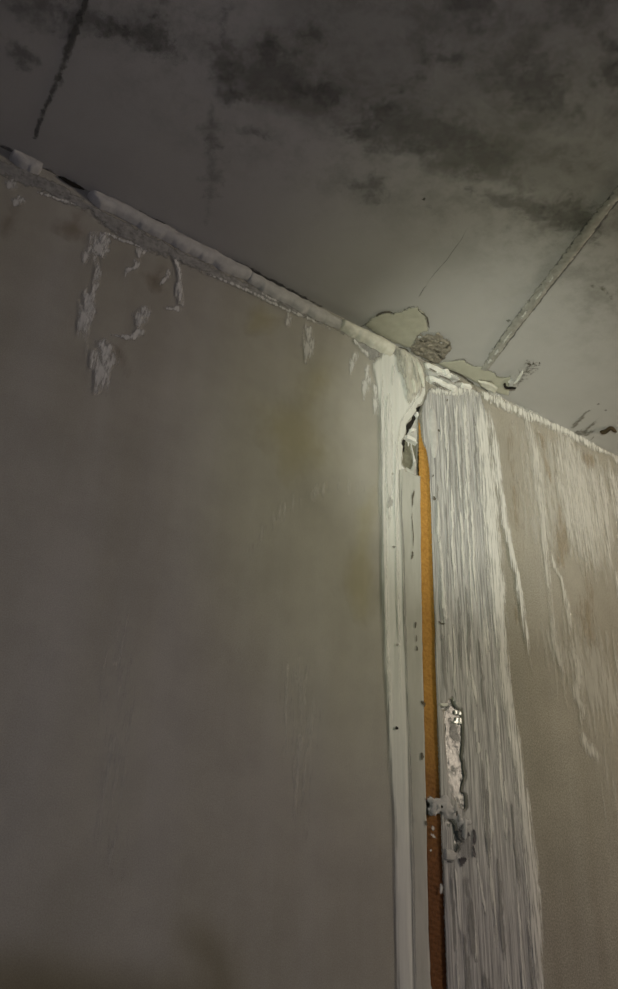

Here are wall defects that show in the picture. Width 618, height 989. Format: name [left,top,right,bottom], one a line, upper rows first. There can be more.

efflorescence [77,232,111,334]
efflorescence [160,259,184,312]
efflorescence [91,306,151,392]
peeling [365,307,523,395]
damp [349,353,618,989]